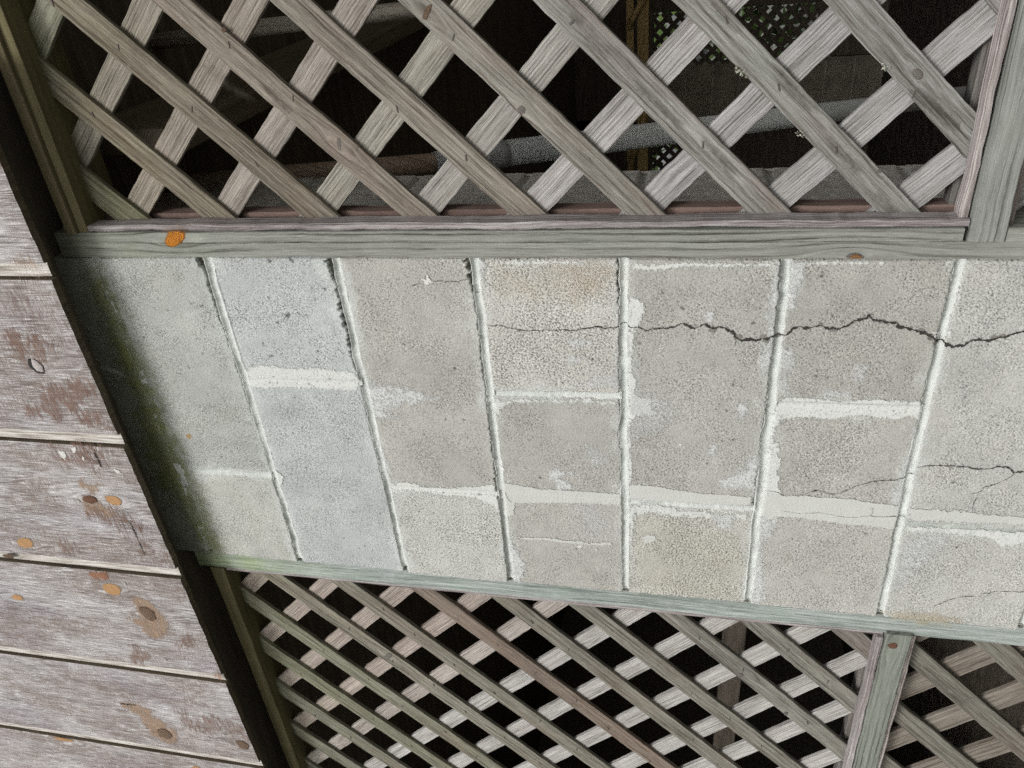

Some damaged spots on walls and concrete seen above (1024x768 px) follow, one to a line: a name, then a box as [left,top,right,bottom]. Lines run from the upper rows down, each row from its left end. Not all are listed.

crack [487,314,1024,348]
crack [770,465,1023,518]